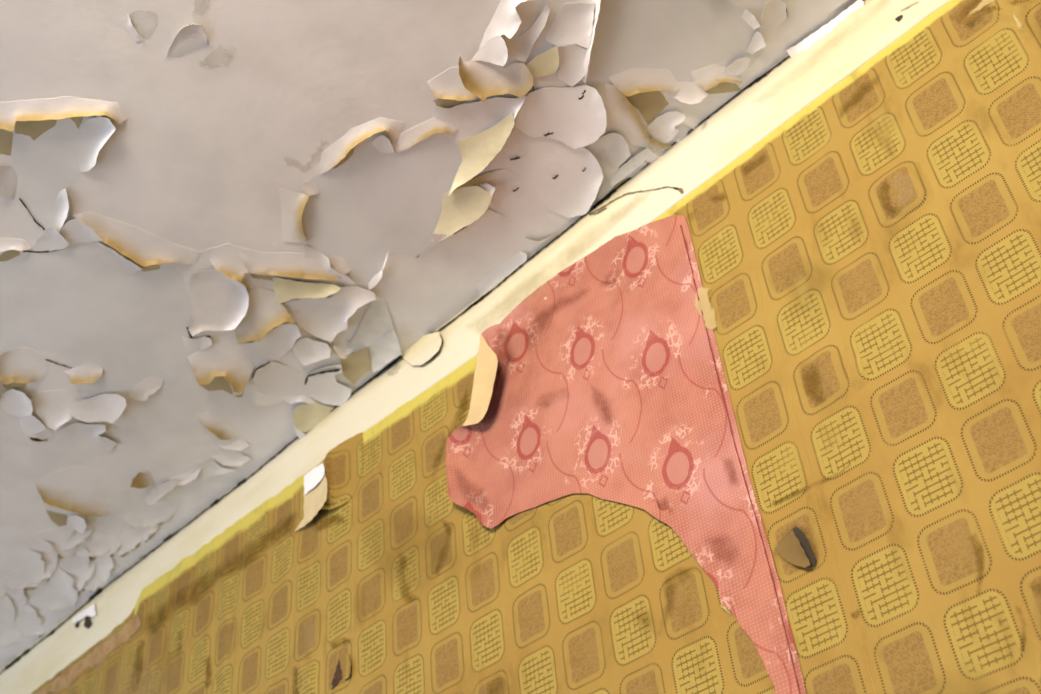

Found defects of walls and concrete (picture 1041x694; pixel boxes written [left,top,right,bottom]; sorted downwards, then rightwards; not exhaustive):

peeling [0,0,787,668]
peeling [787,0,864,58]